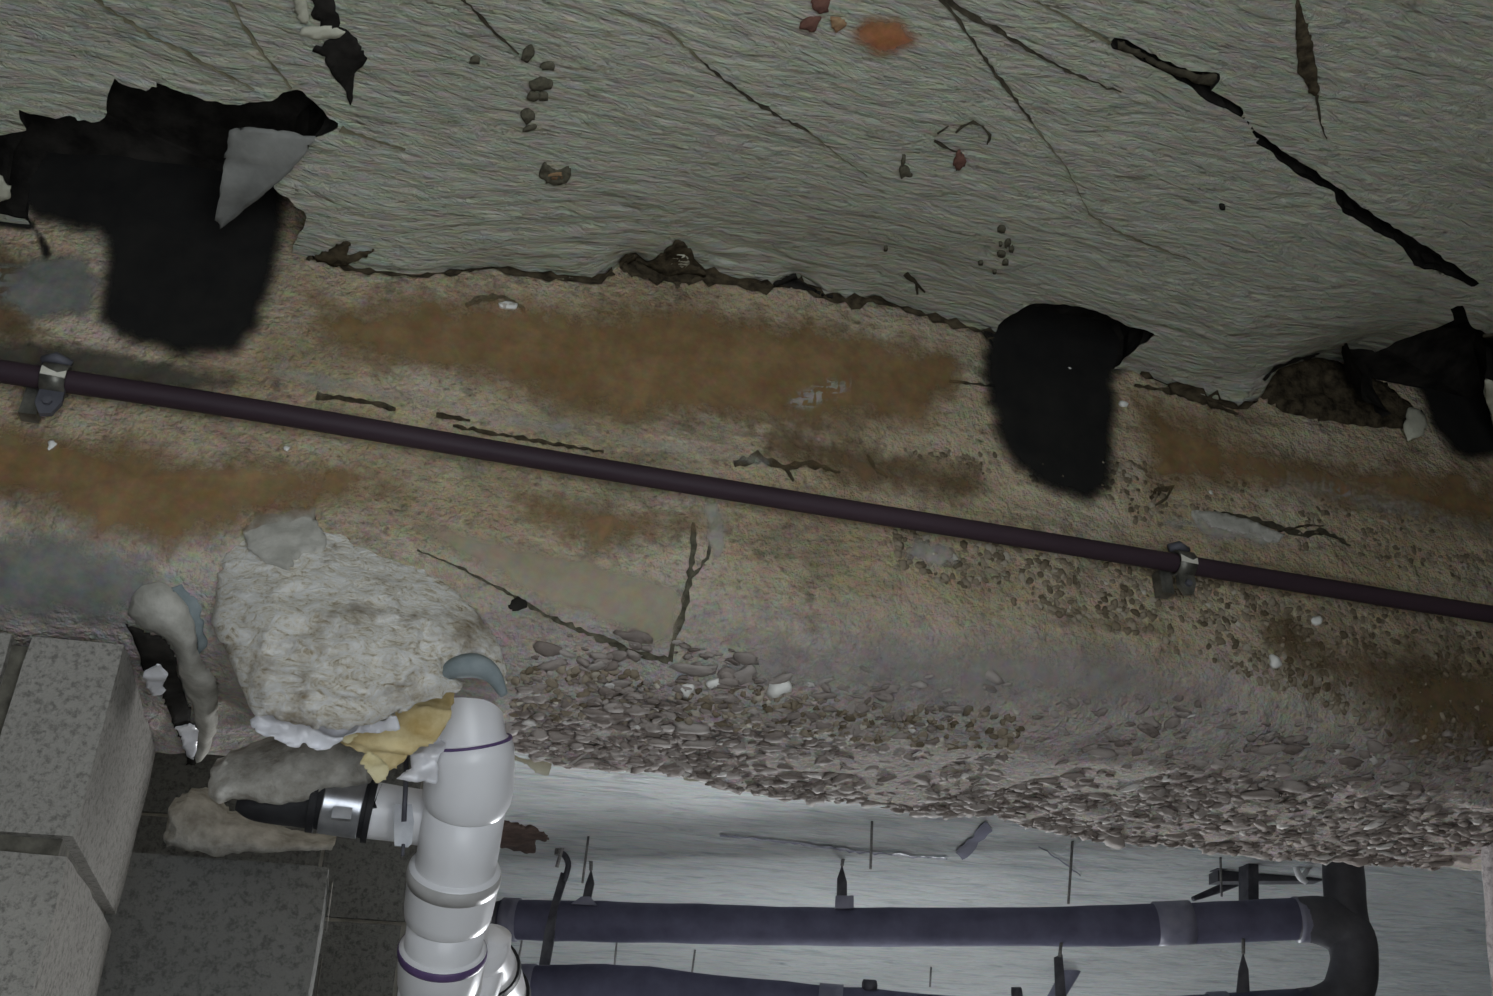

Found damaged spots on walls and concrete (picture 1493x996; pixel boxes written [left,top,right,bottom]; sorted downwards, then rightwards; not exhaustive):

corrosion [799,0,914,54]
crack [610,8,867,176]
crack [939,0,1191,260]
crack [1315,95,1327,139]
damp [794,384,845,404]
spalling [1260,357,1414,429]
spalling [904,447,997,475]
crack [1214,510,1351,546]
crack [417,522,712,664]
spalling [500,528,1493,871]